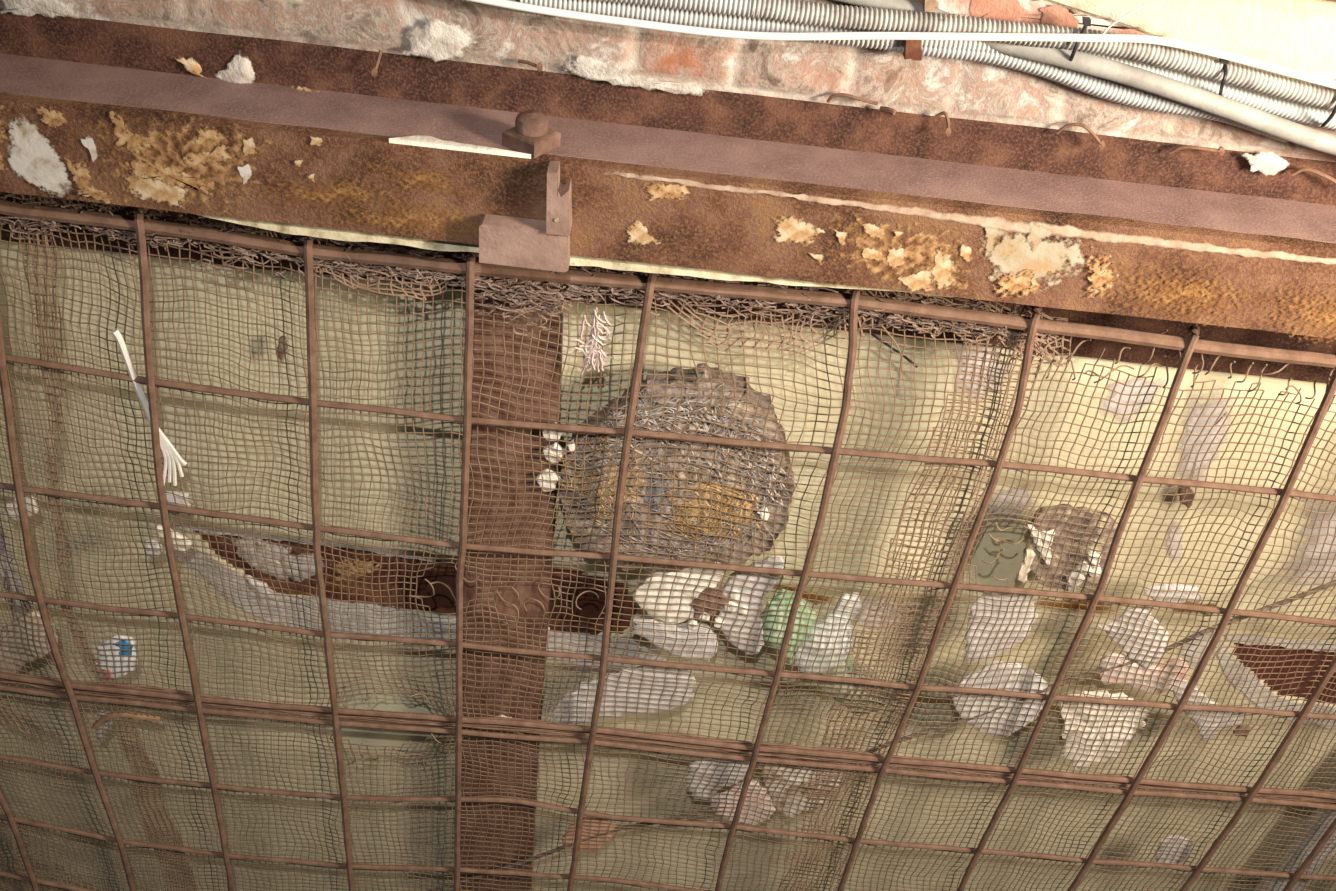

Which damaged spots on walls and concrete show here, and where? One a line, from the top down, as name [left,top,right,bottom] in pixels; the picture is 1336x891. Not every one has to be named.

flaking render [914,0,1151,36]
peeling [0,105,277,218]
rust [264,162,477,239]
peeling [617,172,1336,299]
rust [1099,263,1336,347]
peeling [1179,397,1231,481]
flaking render [173,524,457,641]
flaking render [546,568,663,673]
peeling [1166,524,1183,560]